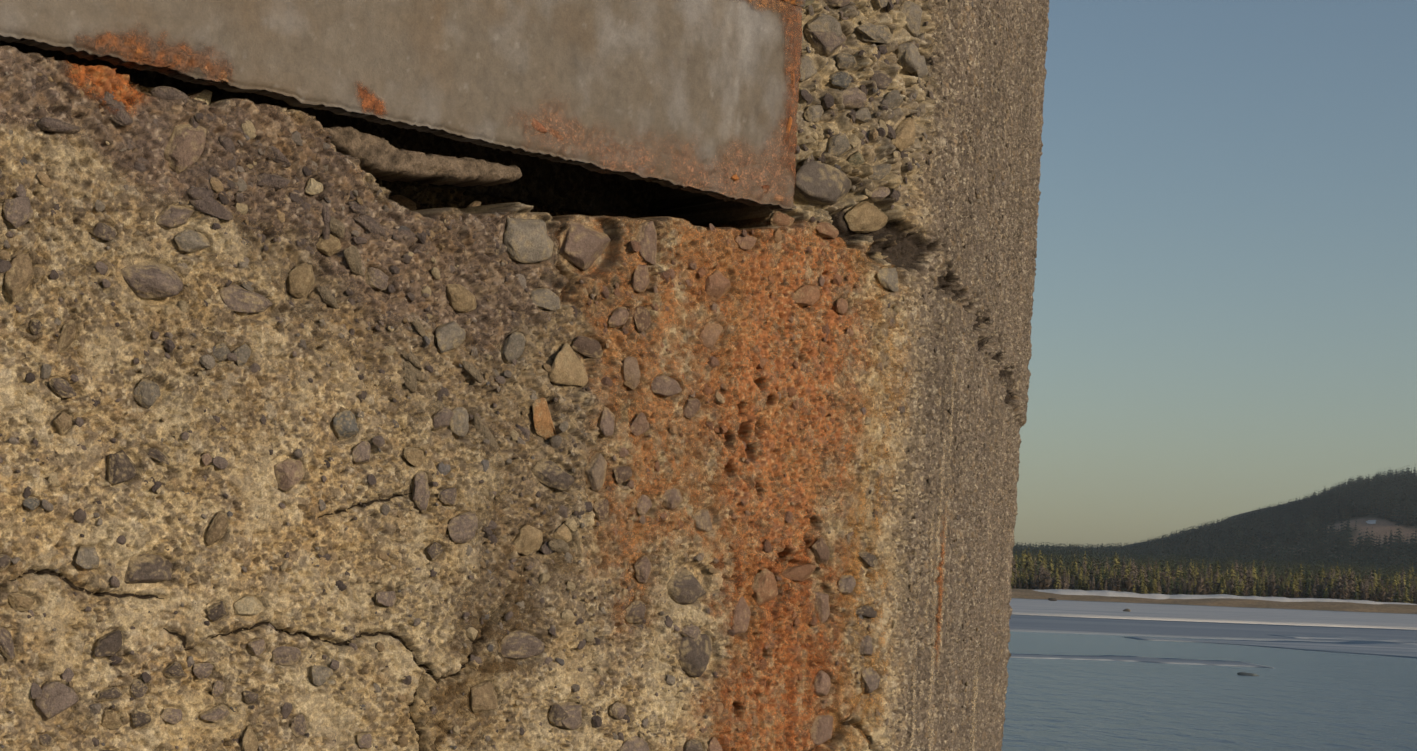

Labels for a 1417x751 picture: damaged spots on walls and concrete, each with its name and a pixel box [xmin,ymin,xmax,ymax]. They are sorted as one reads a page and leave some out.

rust [67,31,233,111]
rust [358,84,385,115]
rust [525,0,803,205]
spalling [0,46,637,640]
crack [318,493,412,518]
rust [579,220,904,751]
crack [9,569,495,751]
crack [809,692,872,751]